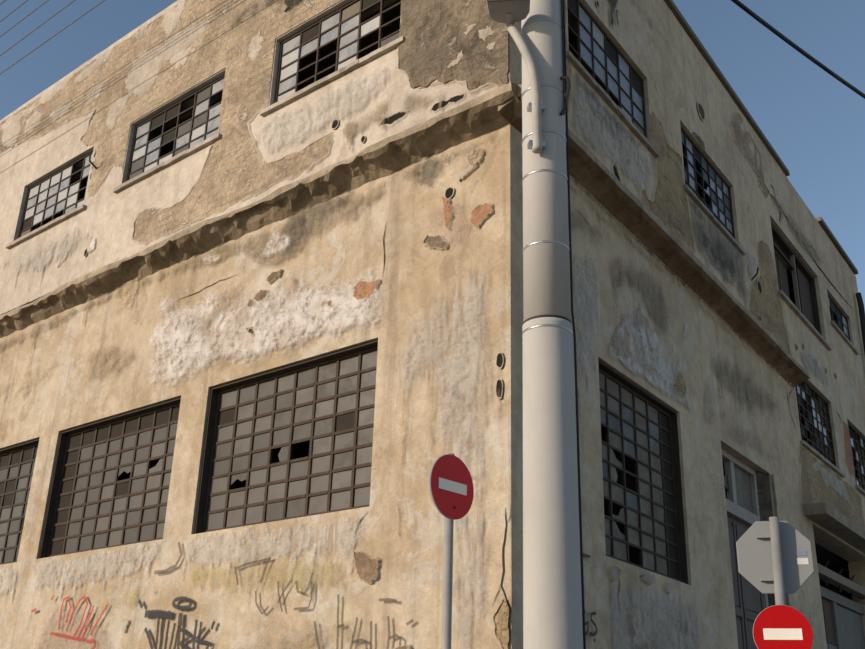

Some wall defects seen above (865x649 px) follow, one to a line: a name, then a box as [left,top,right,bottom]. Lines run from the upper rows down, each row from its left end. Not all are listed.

spalling [0,0,341,245]
spalling [455,148,486,181]
damp [691,200,758,307]
peeling [150,269,382,383]
peeling [610,307,691,409]
crack [492,509,512,613]